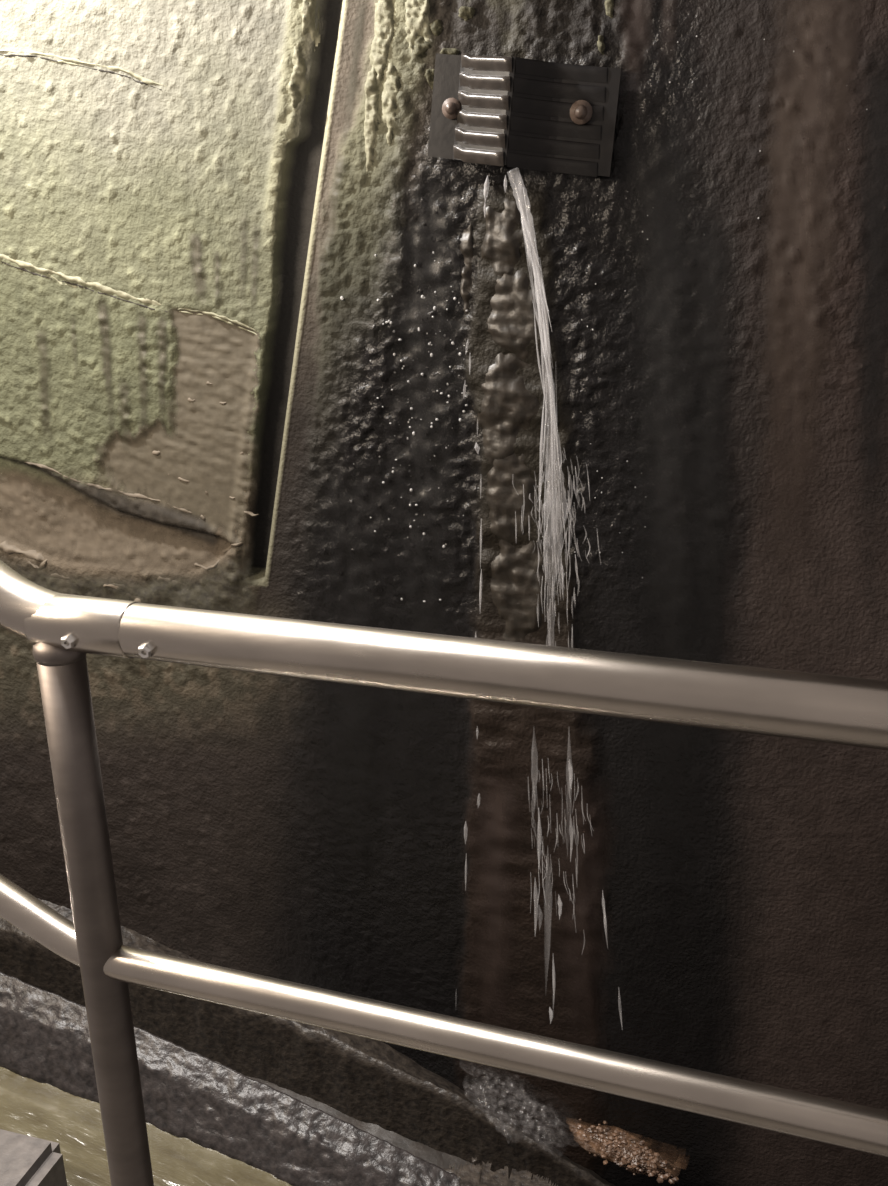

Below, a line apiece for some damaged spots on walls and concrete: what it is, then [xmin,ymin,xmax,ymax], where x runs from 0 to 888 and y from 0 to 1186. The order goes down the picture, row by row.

crack [0,50,166,90]
leakage [350,0,432,171]
peeling [0,309,260,613]